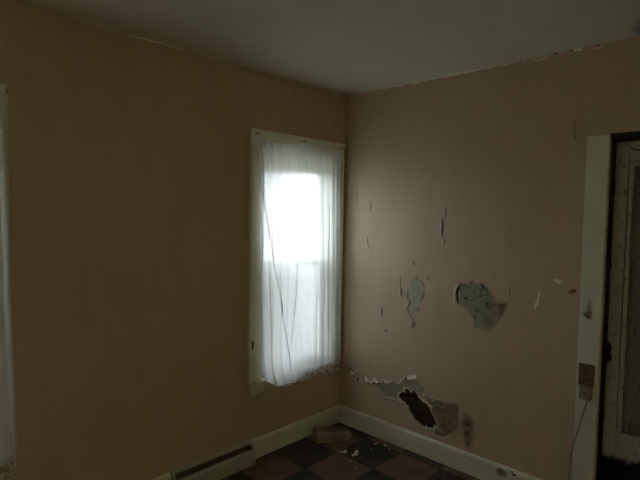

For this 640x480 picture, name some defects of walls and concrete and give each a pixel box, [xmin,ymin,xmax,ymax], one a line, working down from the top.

peeling [453,279,499,333]
flaking render [365,372,463,440]